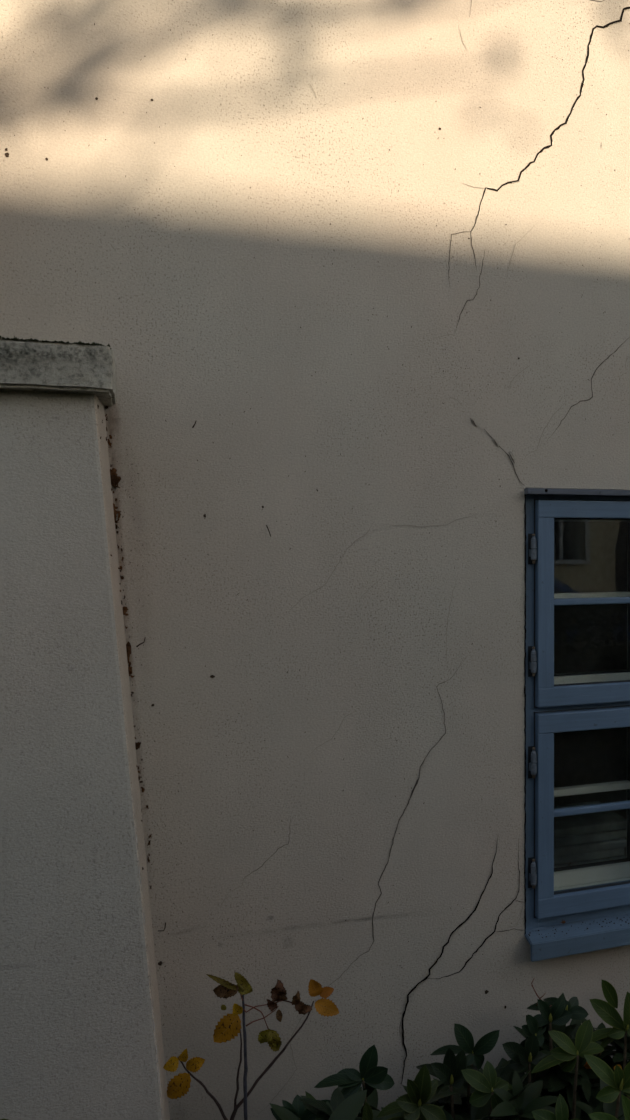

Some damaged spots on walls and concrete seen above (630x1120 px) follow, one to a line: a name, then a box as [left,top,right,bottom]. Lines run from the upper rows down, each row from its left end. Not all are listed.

crack [437,0,630,338]
crack [448,344,630,483]
crack [331,575,468,984]
crack [399,839,523,1084]